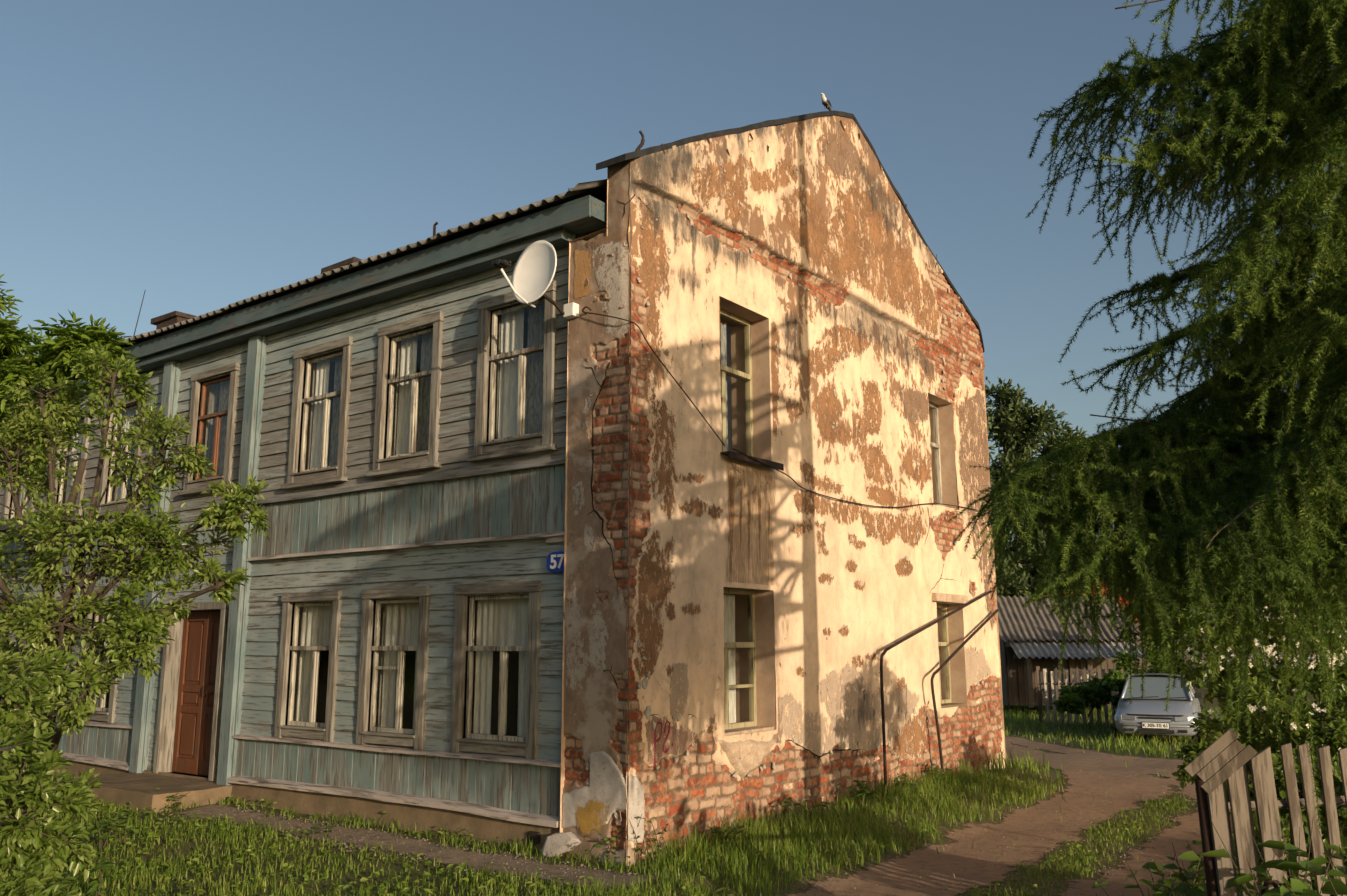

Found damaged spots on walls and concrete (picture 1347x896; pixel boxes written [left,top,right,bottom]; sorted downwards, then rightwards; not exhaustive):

flaking render [564,132,1003,863]